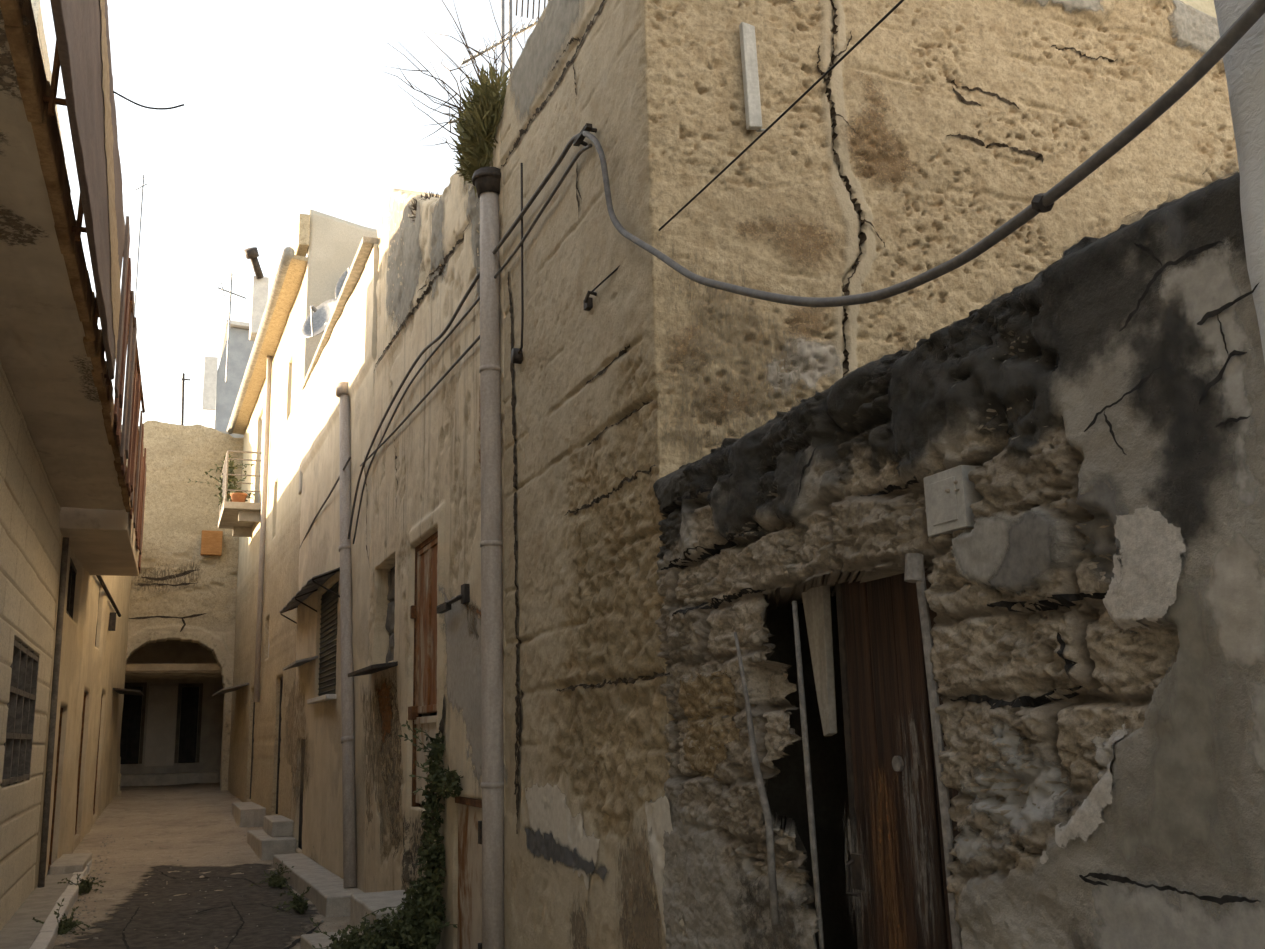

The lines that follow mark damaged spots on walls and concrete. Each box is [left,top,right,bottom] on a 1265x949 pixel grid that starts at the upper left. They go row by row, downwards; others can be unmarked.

crack [817,0,885,377]
crack [1119,241,1223,332]
water stain [660,164,1239,542]
crack [1084,367,1160,455]
water stain [1075,477,1126,580]
peeling [1103,505,1186,634]
peeling [1040,723,1128,865]
crack [1079,873,1261,905]